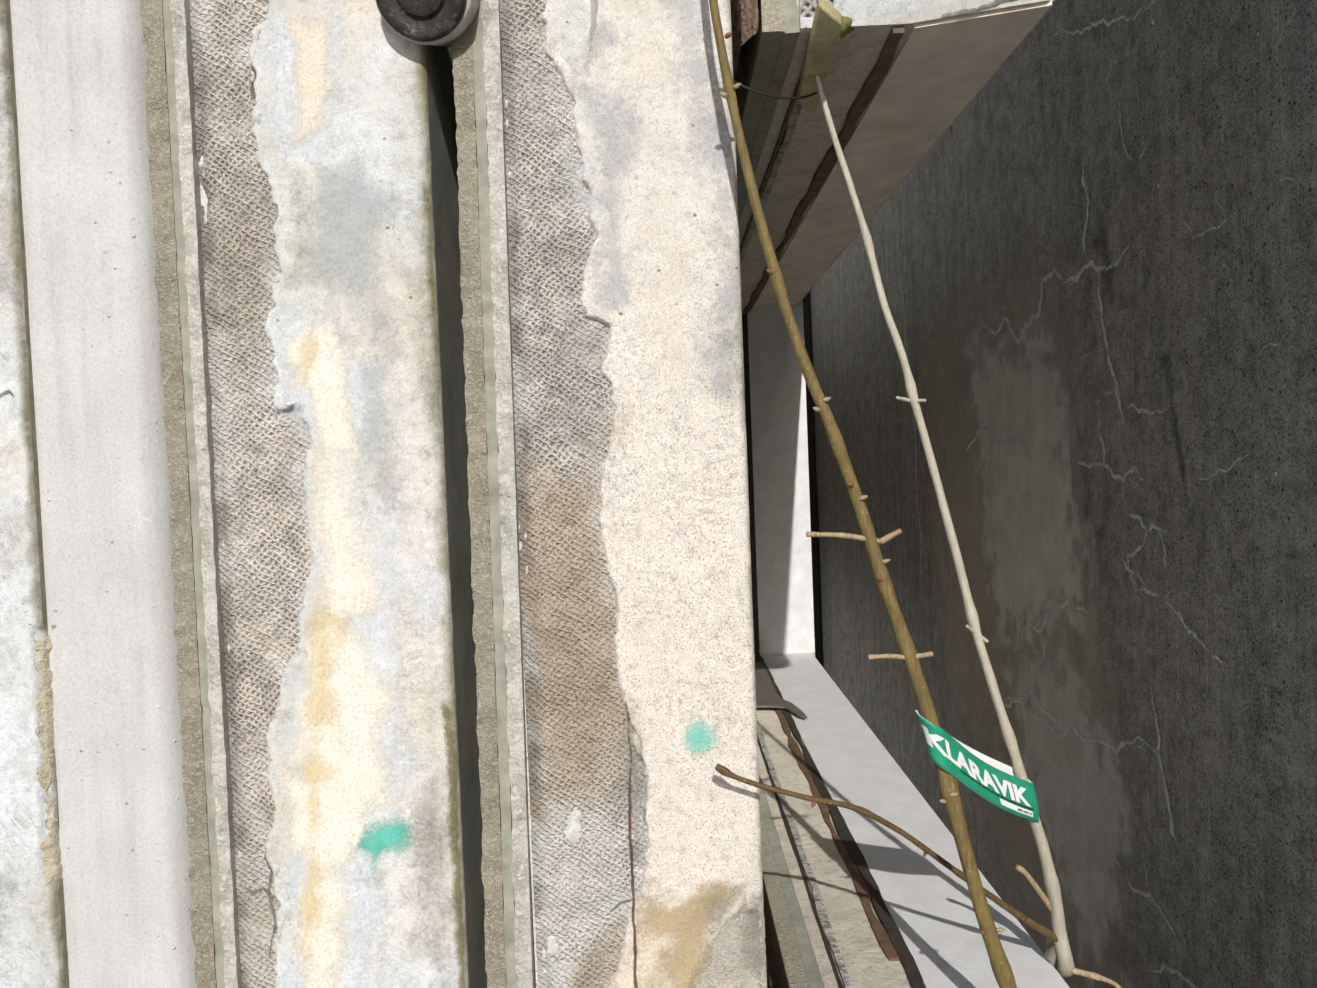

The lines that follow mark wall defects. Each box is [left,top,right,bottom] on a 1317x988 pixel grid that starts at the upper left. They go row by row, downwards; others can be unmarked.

peeling [799,0,833,18]
crack [942,0,1007,17]
crack [1056,0,1157,53]
peeling [190,0,313,988]
peeling [500,0,648,988]
crack [964,163,1226,663]
crack [1196,450,1251,480]
leakage [279,304,417,988]
crack [610,705,648,988]
spalling [757,721,854,988]
crack [983,599,1182,850]
crack [1112,854,1197,988]